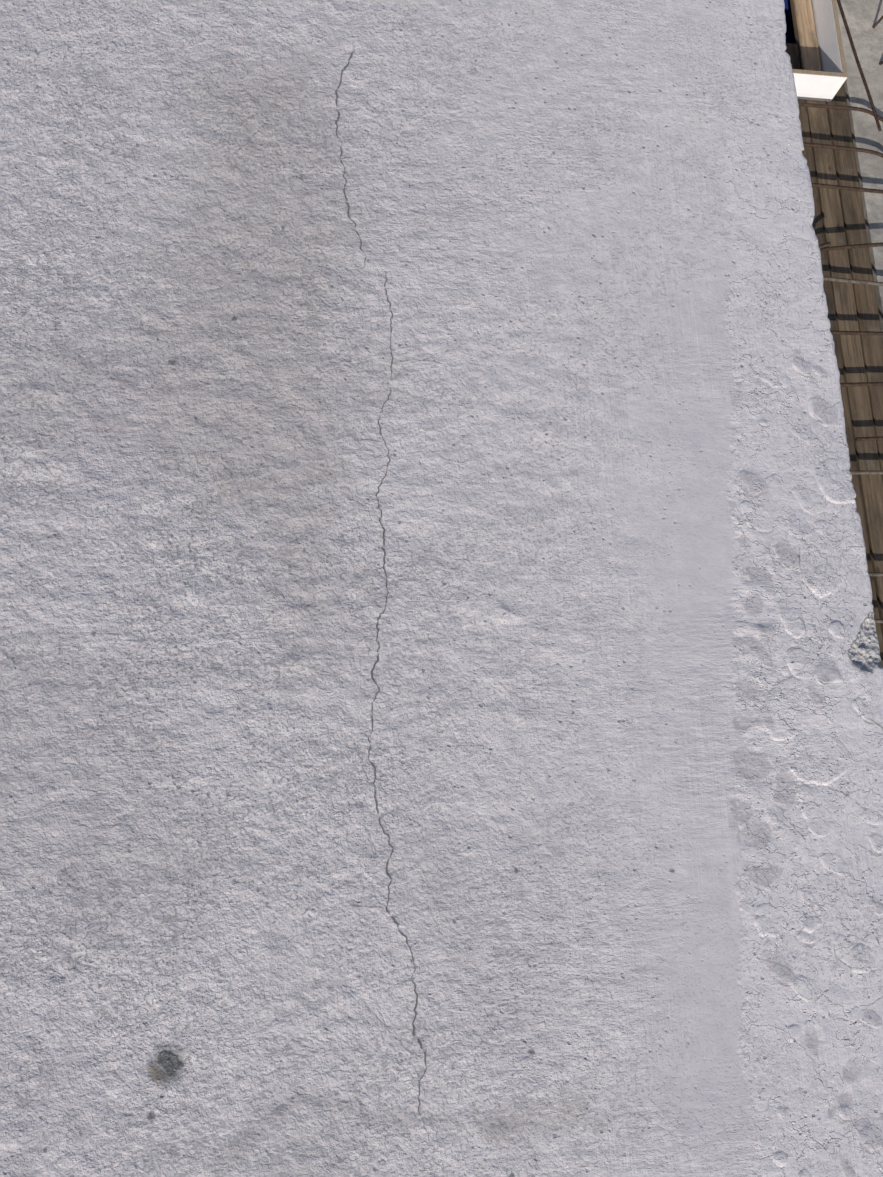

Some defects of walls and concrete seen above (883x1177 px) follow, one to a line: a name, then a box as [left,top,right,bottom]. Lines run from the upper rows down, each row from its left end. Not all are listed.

crack [335,53,429,1139]